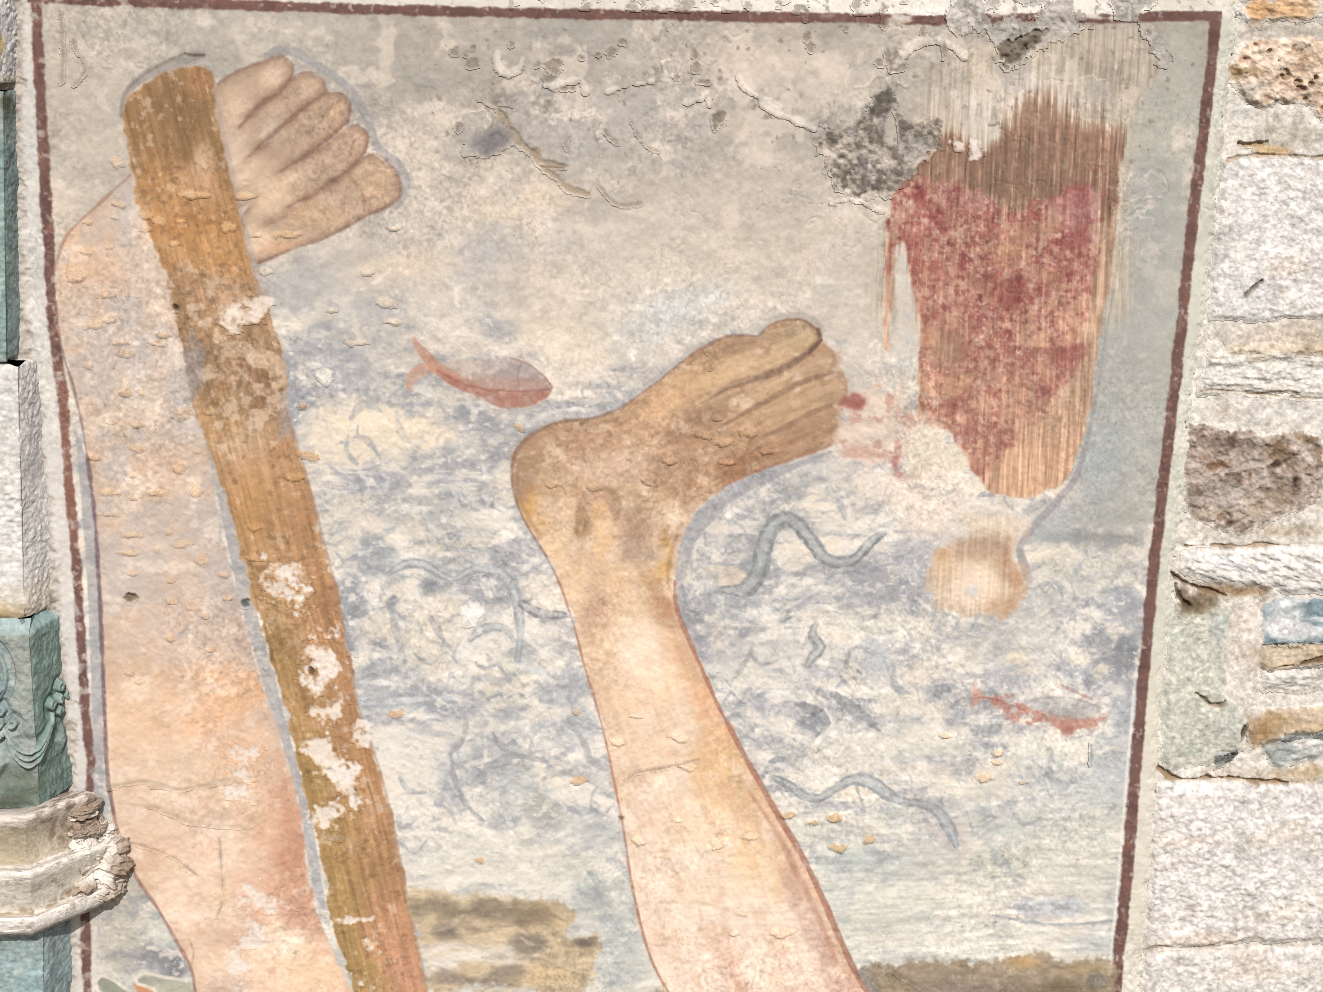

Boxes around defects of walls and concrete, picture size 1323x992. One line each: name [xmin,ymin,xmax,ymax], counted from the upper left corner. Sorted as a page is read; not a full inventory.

peeling [578,0,753,31]
spalling [1109,0,1175,69]
spalling [448,38,727,134]
spalling [736,0,1096,214]
peeling [215,293,276,343]
peeling [170,397,216,498]
peeling [283,449,321,483]
peeling [114,528,406,842]
peeling [570,774,588,786]